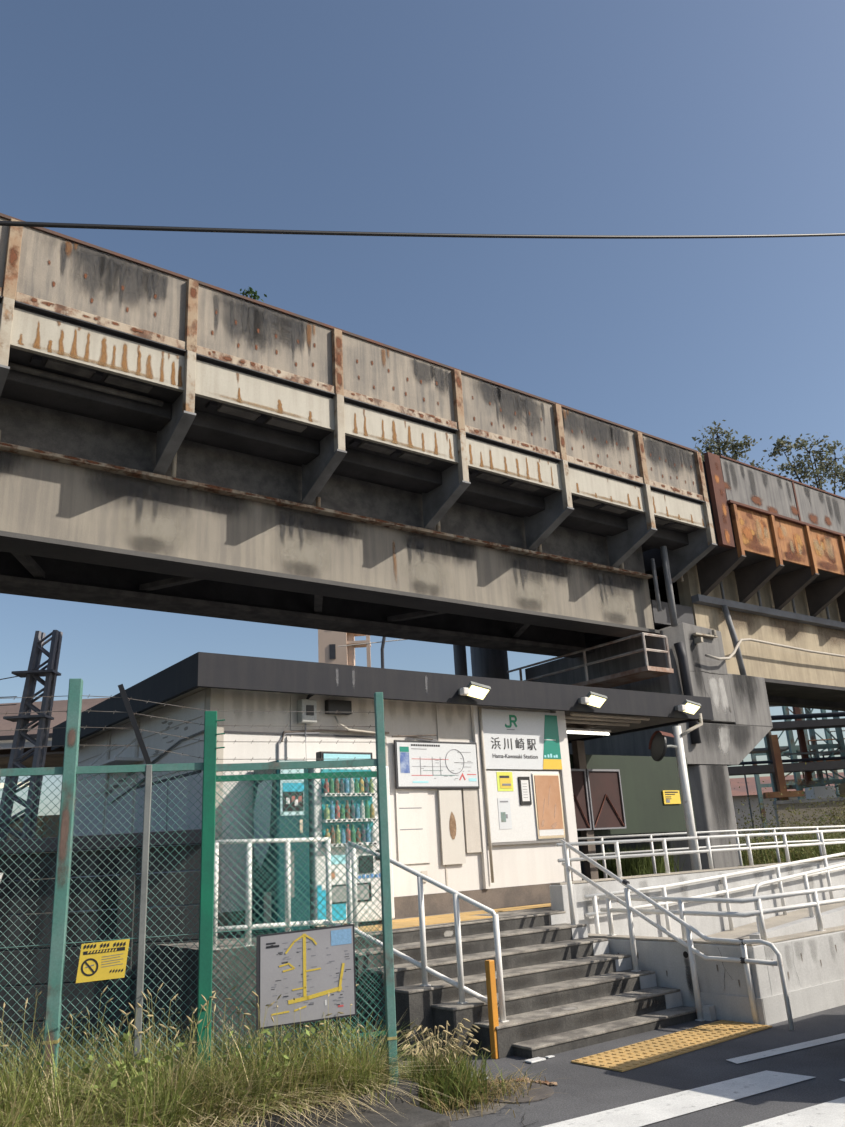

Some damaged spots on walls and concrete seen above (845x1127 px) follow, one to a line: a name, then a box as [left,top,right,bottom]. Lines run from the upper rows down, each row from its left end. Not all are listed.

water stain [61,243,167,302]
rust [18,298,182,387]
water stain [214,296,310,354]
water stain [413,360,449,390]
water stain [480,380,544,429]
rust [469,402,704,526]
water stain [562,411,627,448]
water stain [643,438,694,470]
water stain [96,470,190,543]
water stain [277,506,351,566]
water stain [407,532,474,587]
rust [752,496,832,526]